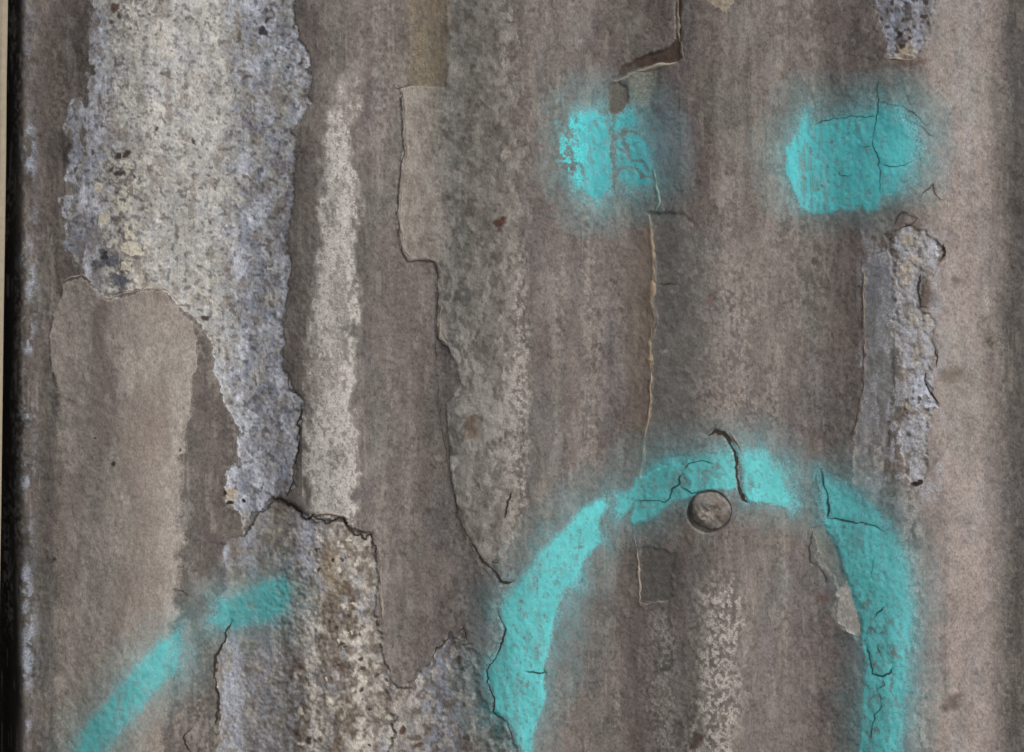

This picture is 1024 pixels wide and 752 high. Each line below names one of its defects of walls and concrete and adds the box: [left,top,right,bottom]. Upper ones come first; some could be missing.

peeling [609,0,684,114]
peeling [875,0,935,61]
crack [815,79,934,193]
peeling [49,0,530,752]
crack [639,429,747,503]
peeling [812,526,862,640]
crack [809,471,886,584]
peeling [852,224,950,748]